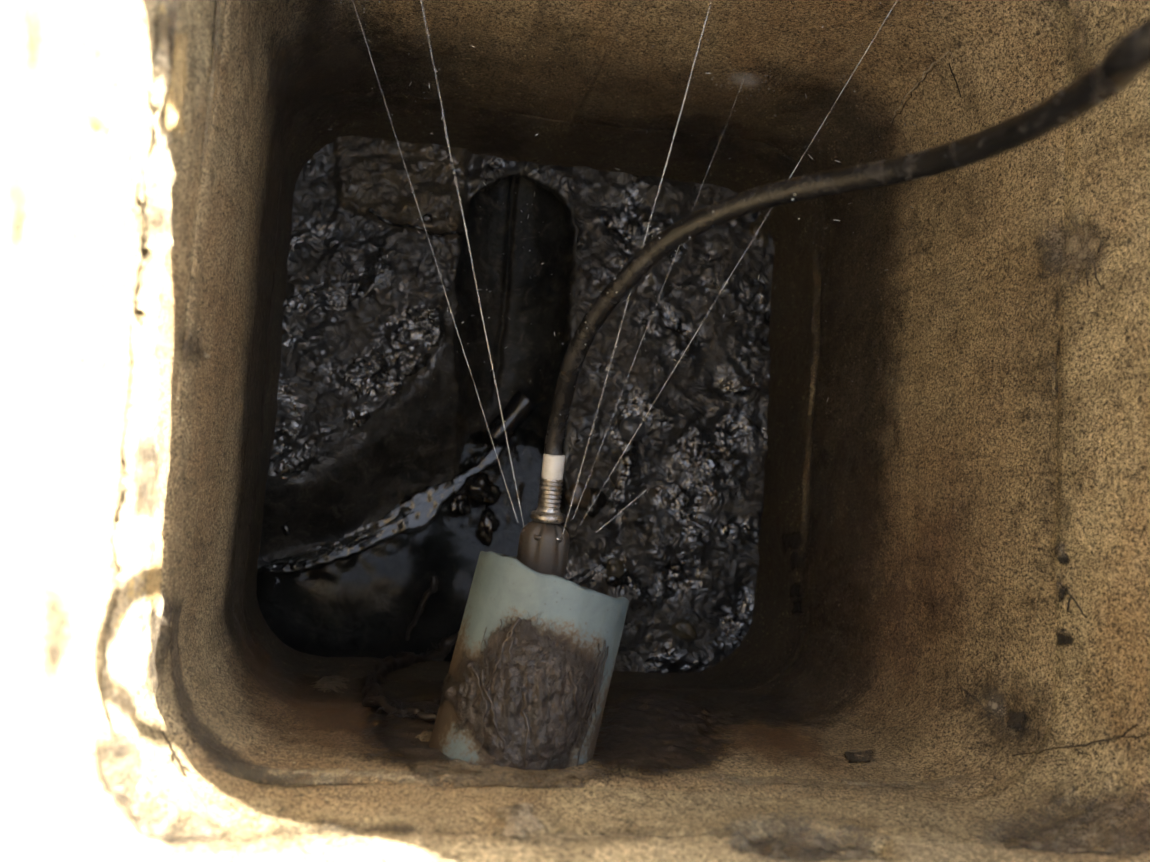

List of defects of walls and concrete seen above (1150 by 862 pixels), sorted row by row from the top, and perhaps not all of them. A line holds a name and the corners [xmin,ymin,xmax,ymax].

crack [1012,724,1149,758]